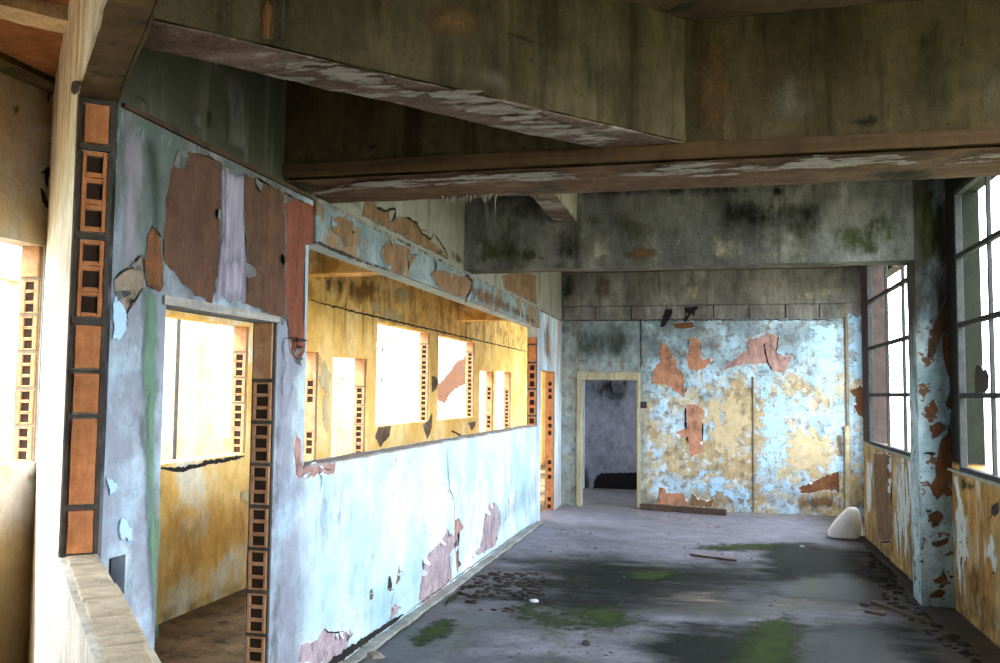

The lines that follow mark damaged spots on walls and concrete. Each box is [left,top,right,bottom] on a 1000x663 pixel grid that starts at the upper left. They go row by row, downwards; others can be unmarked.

peeling [113,150,223,313]
peeling [242,171,582,366]
water stain [600,187,735,195]
mould [726,203,819,227]
crack [308,299,526,352]
peeling [651,321,713,458]
spalling [161,355,268,661]
peeling [418,502,501,605]
water stain [471,542,893,609]
peeling [924,390,952,528]
peeling [298,628,353,663]
water stain [633,622,764,663]